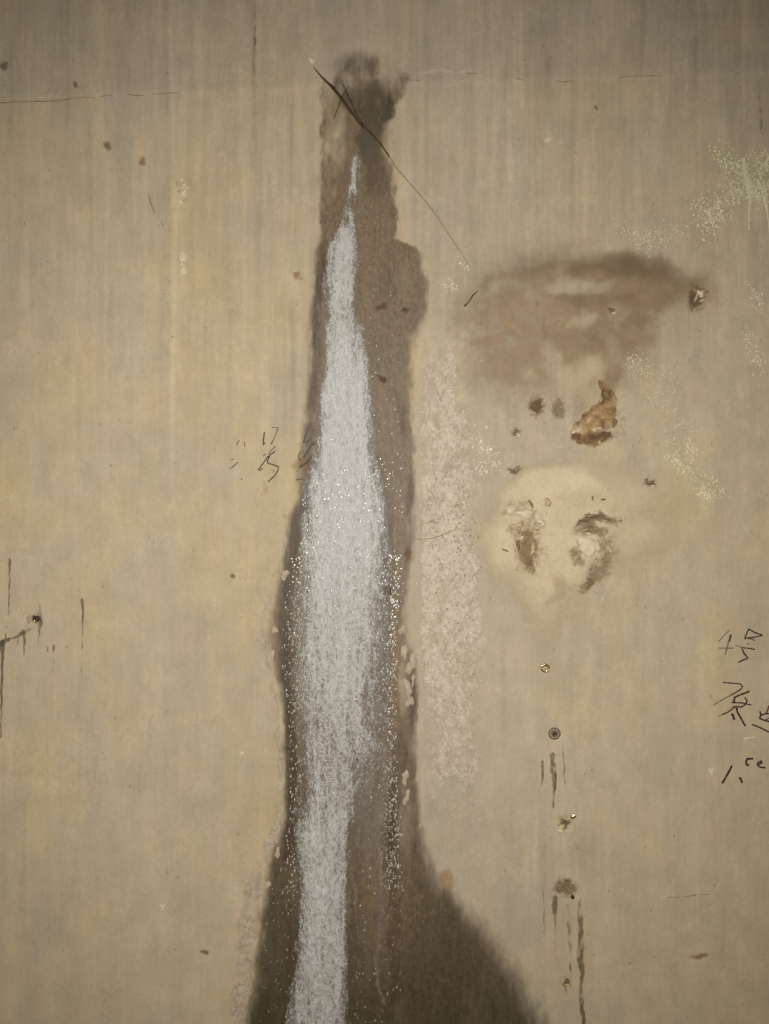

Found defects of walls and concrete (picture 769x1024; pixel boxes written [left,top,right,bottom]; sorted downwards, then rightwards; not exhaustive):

damp [481,254,700,387]
spalling [571,380,618,447]
damp [232,60,534,1024]
spalling [501,497,552,572]
spalling [571,496,622,590]